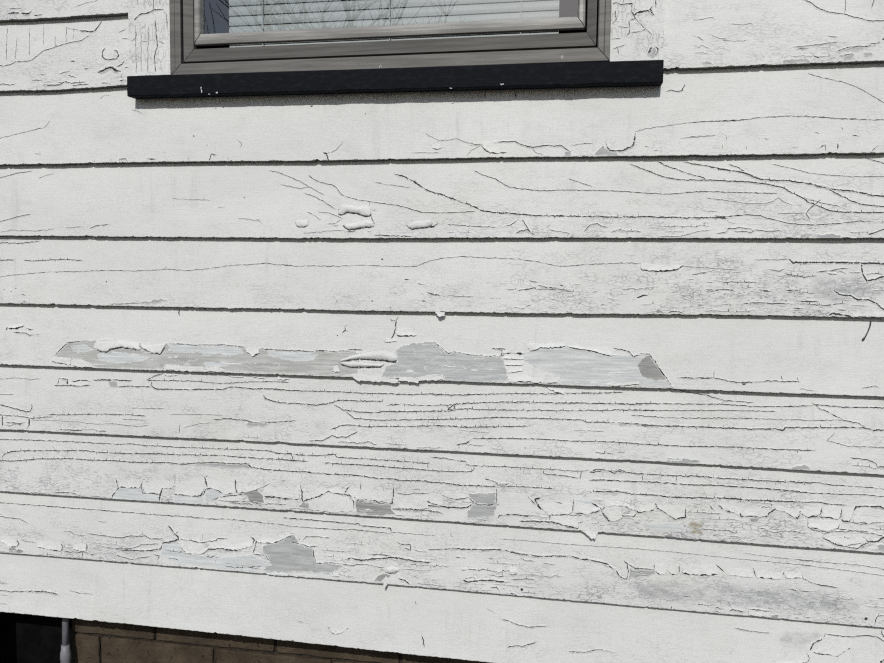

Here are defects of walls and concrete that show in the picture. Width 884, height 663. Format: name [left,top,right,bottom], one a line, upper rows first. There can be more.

crack [0,0,168,99]
crack [611,0,660,59]
crack [269,73,884,238]
crack [0,213,640,278]
crack [692,258,884,312]
peeling [50,338,674,395]
crack [0,371,884,663]
peeling [31,472,884,553]
peeling [0,524,563,596]
peeling [663,595,779,619]
peeling [603,559,854,601]
peeling [778,632,884,663]